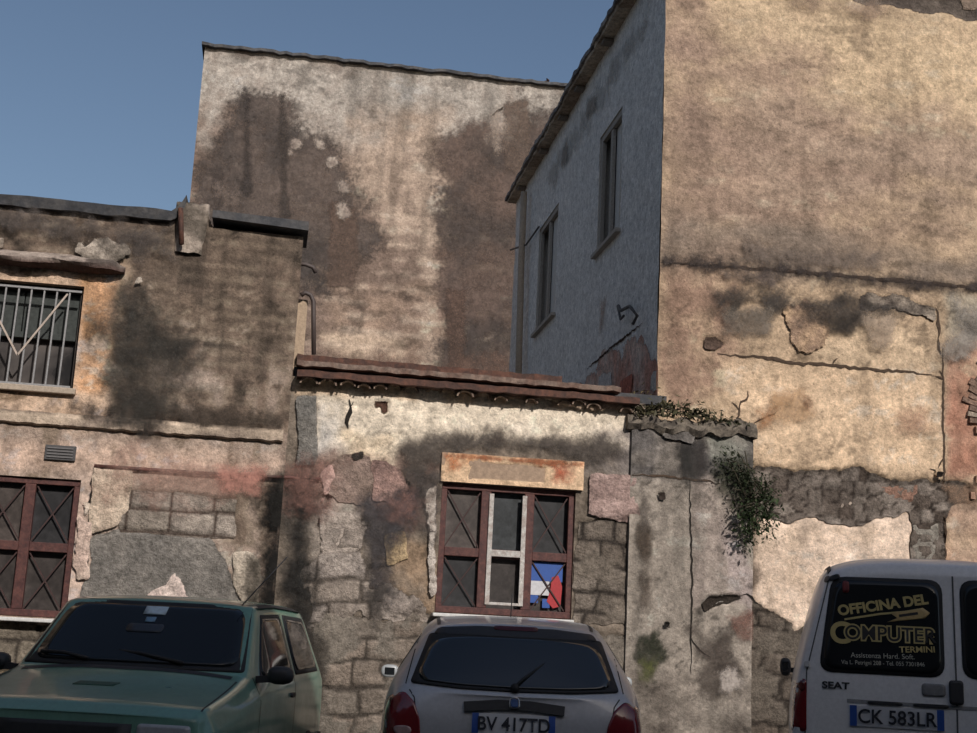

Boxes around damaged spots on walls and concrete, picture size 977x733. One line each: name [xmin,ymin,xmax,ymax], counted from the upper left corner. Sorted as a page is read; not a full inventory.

spalling [853,0,977,21]
damp [71,285,284,435]
damp [192,87,385,296]
damp [424,86,553,372]
crack [661,262,966,484]
damp [714,238,914,349]
peeling [73,490,239,601]
corrosion [481,455,576,477]
crack [635,474,720,670]
flaking render [753,466,968,560]
crack [941,516,949,560]
flaking render [702,595,804,733]